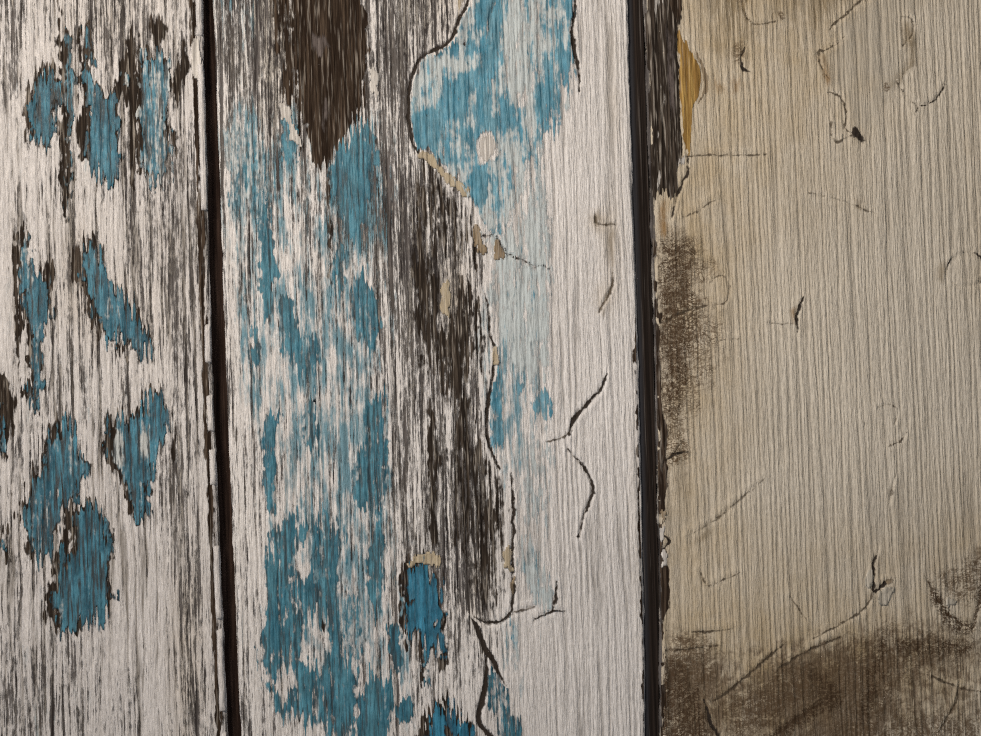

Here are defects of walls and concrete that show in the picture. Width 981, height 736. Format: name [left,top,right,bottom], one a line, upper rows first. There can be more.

peeling [645,0,708,200]
crack [734,46,750,72]
peeling [222,0,386,457]
peeling [0,221,119,641]
peeling [22,0,224,736]
peeling [254,0,581,736]
crack [474,297,516,624]
crack [547,374,607,537]
water stain [656,232,717,444]
water stain [661,635,715,736]
crack [713,555,895,701]
water stain [722,556,981,736]